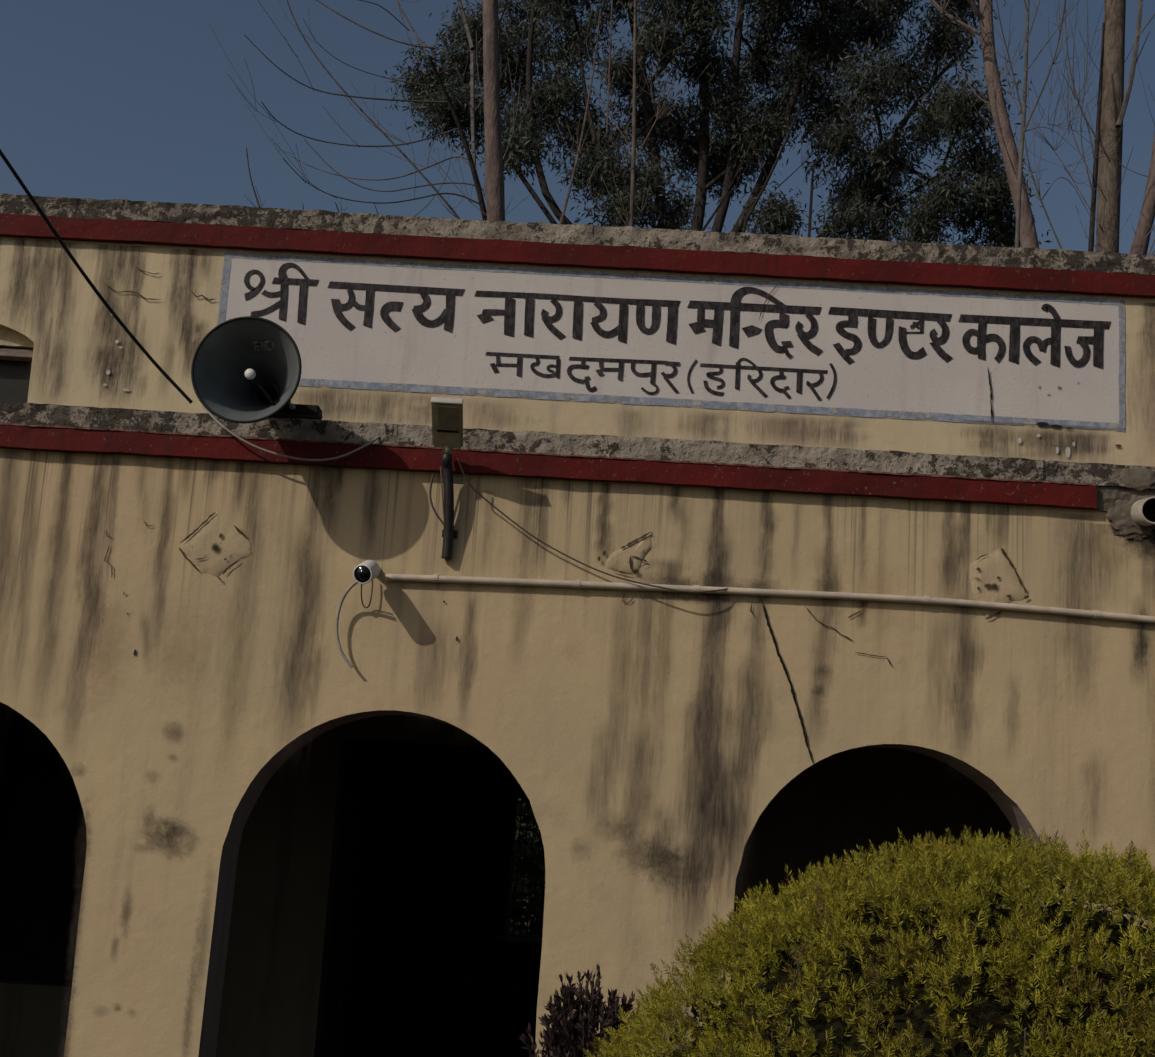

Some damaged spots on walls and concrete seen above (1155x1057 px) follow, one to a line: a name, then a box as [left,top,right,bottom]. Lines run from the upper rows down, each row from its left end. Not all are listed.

leakage [171,249,200,364]
spalling [179,511,252,582]
leakage [286,567,313,694]
leakage [683,488,732,903]
crack [750,600,814,767]